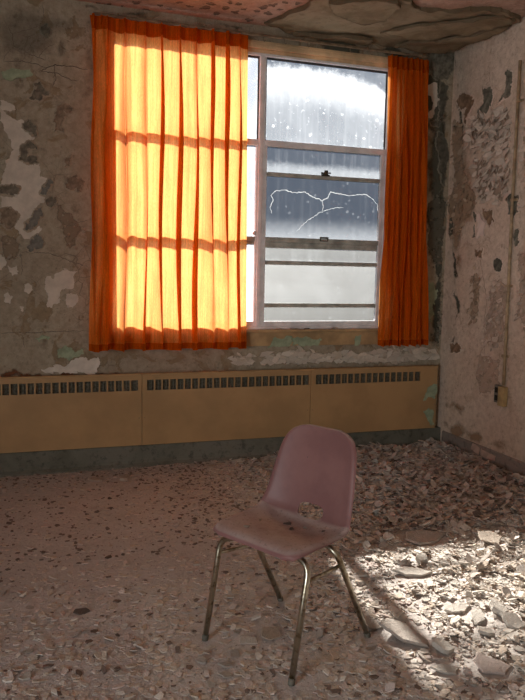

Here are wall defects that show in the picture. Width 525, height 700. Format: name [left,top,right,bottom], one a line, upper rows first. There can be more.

peeling [121,0,302,22]
flaking render [18,119,39,166]
peeling [0,154,86,272]
peeling [228,53,525,367]
damp [427,74,471,277]
damp [432,262,442,330]